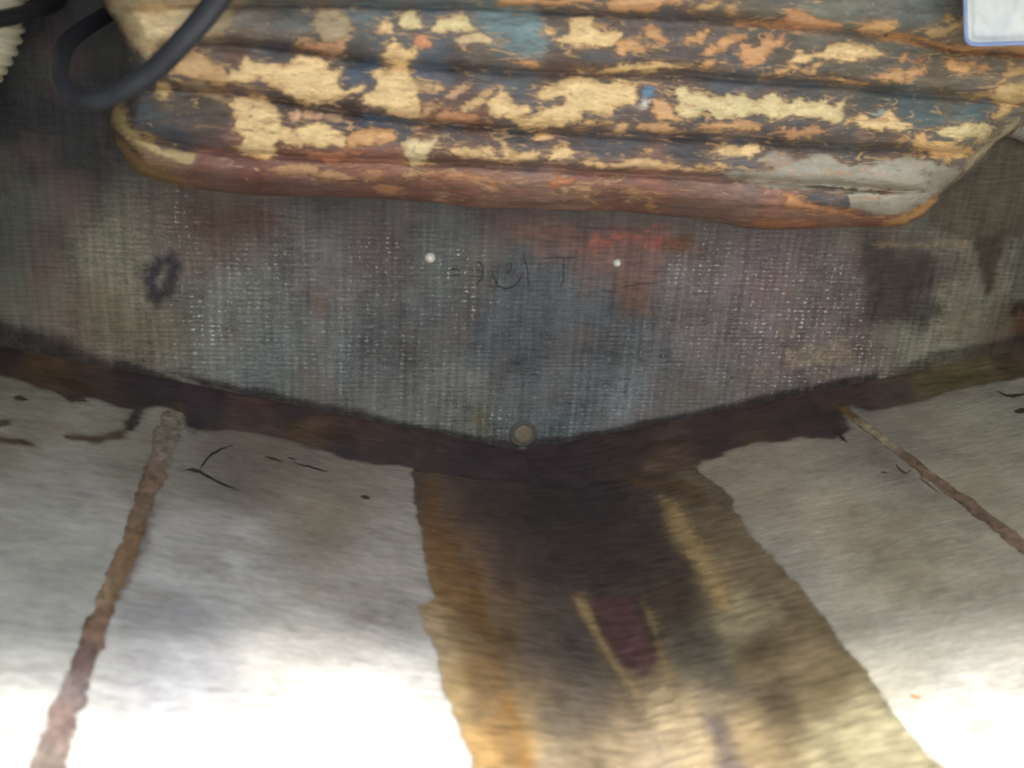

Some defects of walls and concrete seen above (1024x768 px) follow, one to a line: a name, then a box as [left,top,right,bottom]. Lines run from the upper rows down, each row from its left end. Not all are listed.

peeling [105,0,201,62]
peeling [111,104,196,165]
peeling [154,0,1024,229]
rust [64,415,143,447]
crack [184,445,239,490]
damp [410,405,950,768]